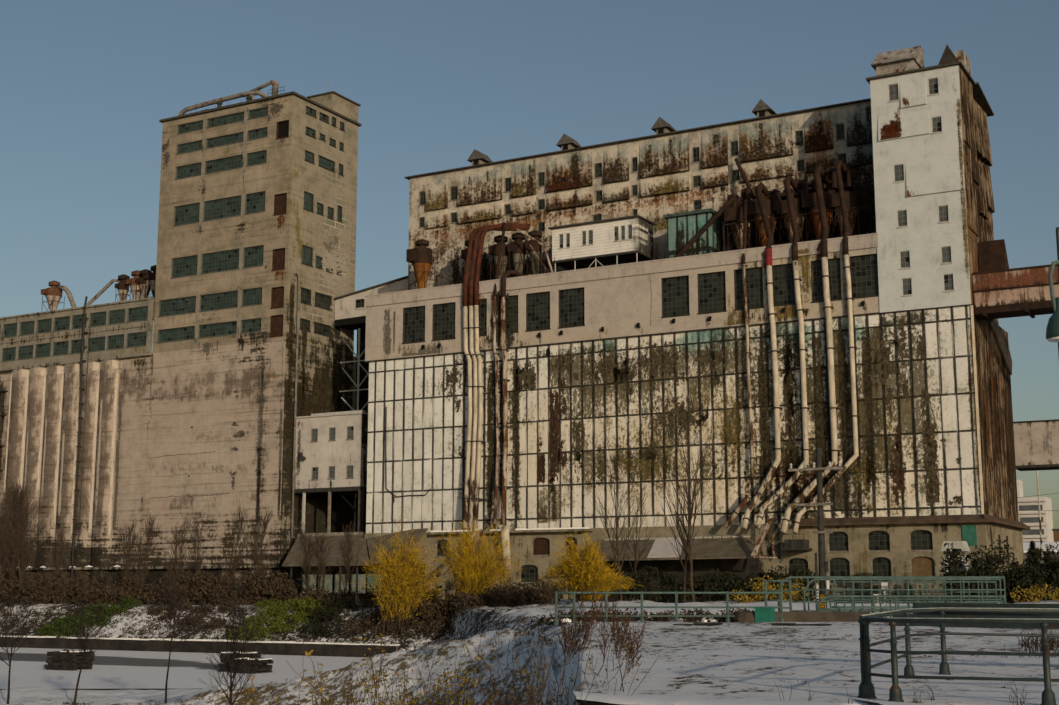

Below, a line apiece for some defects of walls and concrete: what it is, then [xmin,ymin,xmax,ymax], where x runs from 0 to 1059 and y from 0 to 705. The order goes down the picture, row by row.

rust [548,170,581,191]
rust [880,98,909,140]
leakage [0,357,154,540]
leakage [239,335,264,557]
leakage [277,281,345,519]
leakage [487,360,520,518]